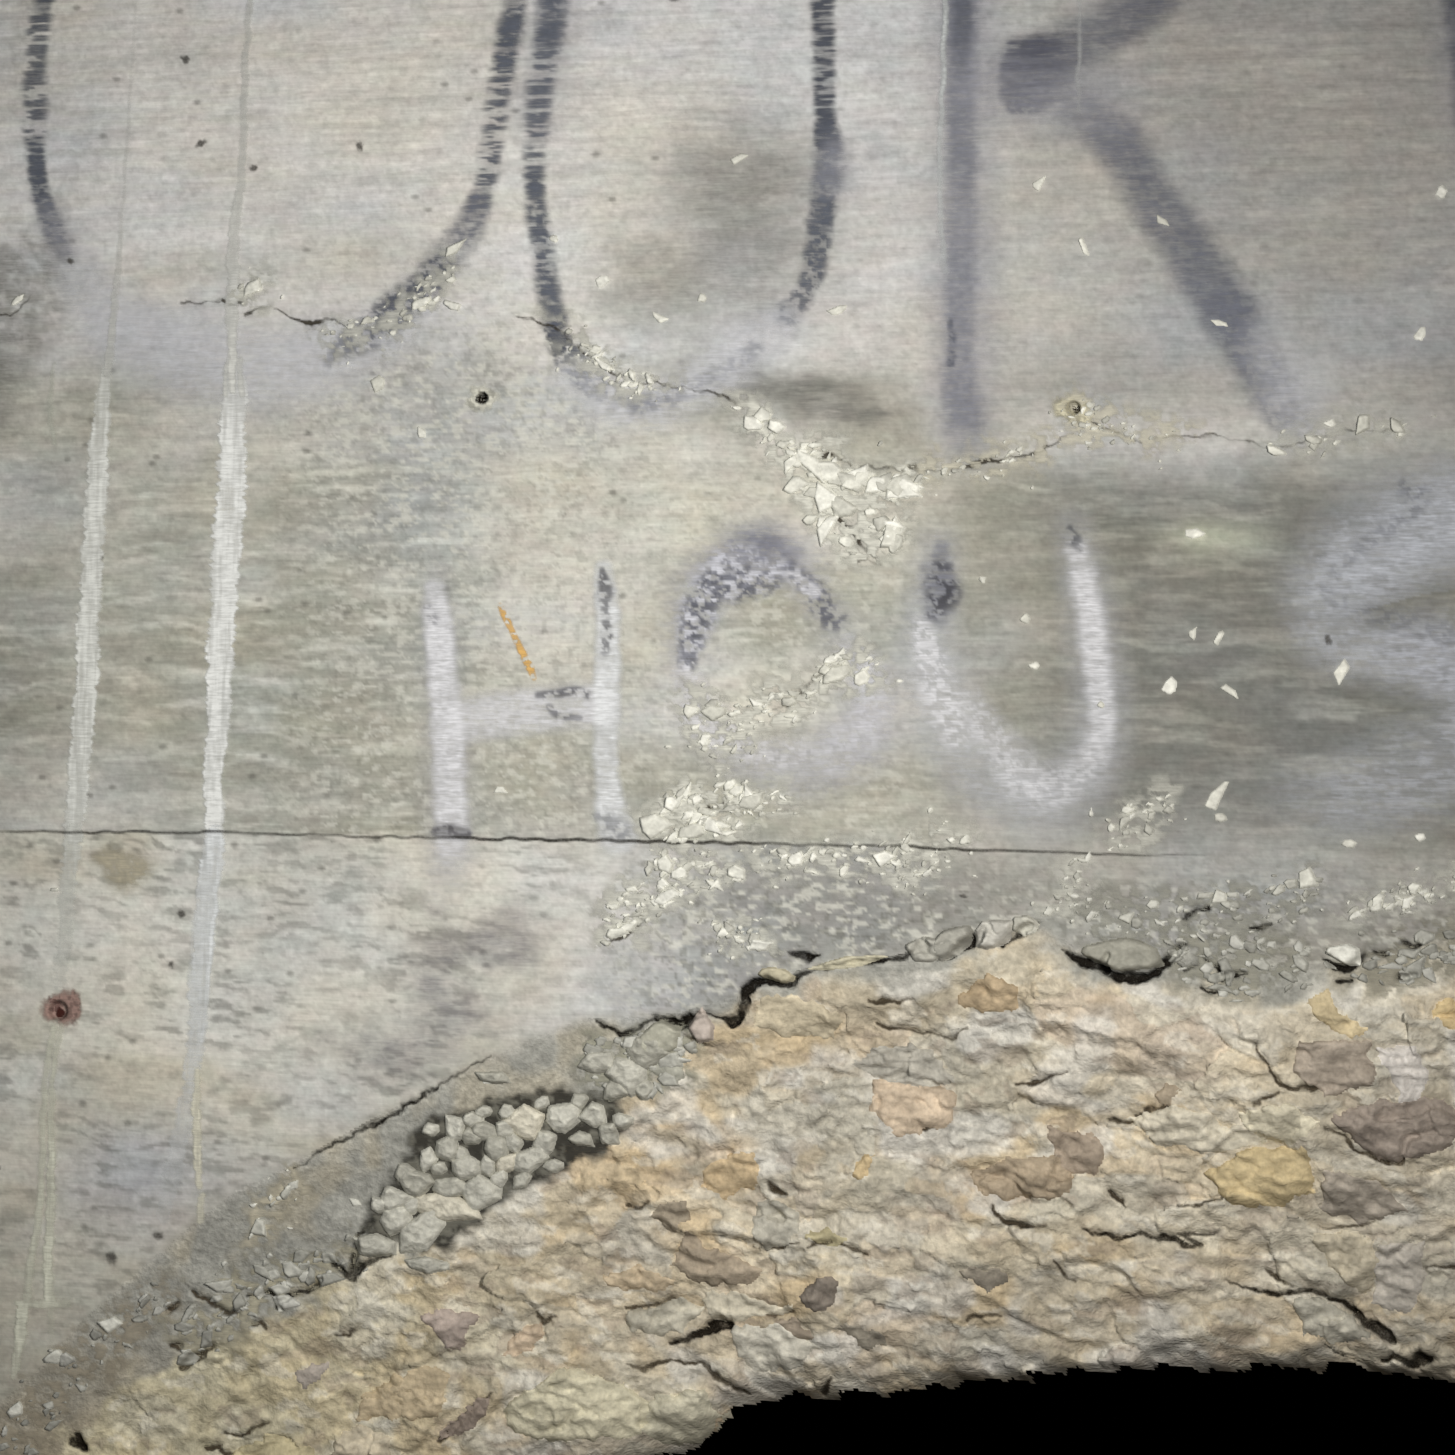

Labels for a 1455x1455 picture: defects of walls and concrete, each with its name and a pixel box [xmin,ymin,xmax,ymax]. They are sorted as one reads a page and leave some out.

crack [185,299,332,326]
spalling [730,391,1194,567]
leakage [60,273,117,931]
leakage [184,0,252,1224]
spalling [1161,677,1177,694]
spalling [1334,658,1350,685]
spalling [594,636,980,960]
crack [596,951,827,1037]
crack [1062,906,1248,994]
crack [1323,940,1421,984]
leakage [12,1025,67,1376]
spalling [0,782,1455,1455]